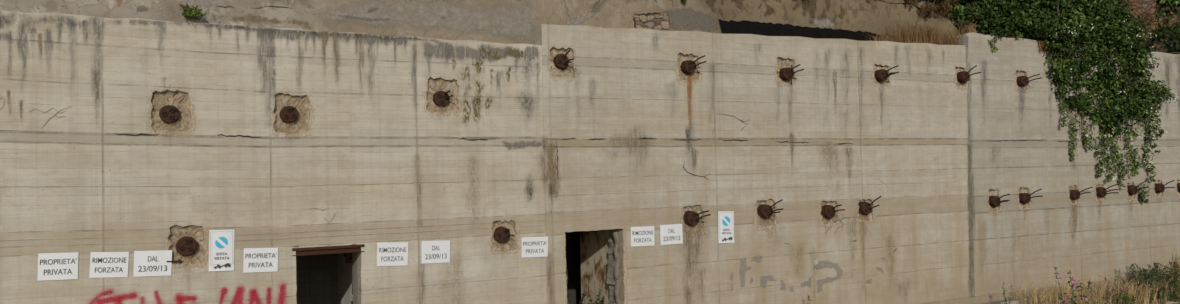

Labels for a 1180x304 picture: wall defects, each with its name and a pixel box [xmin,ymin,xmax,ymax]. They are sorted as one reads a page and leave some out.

damp [0,17,100,66]
damp [204,12,538,122]